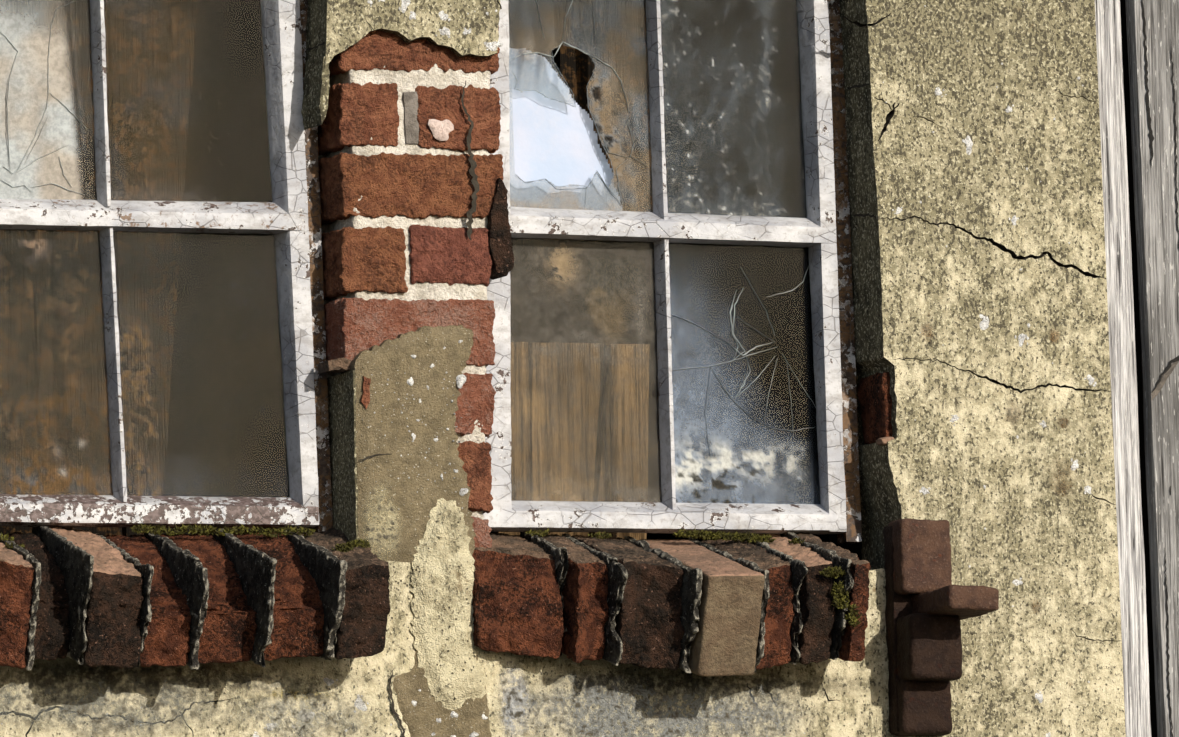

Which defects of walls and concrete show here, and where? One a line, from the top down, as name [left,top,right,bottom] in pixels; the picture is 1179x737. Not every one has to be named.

crack [854,213,1106,279]
spalling [301,30,514,710]
crack [894,358,1109,393]
crack [0,698,238,737]